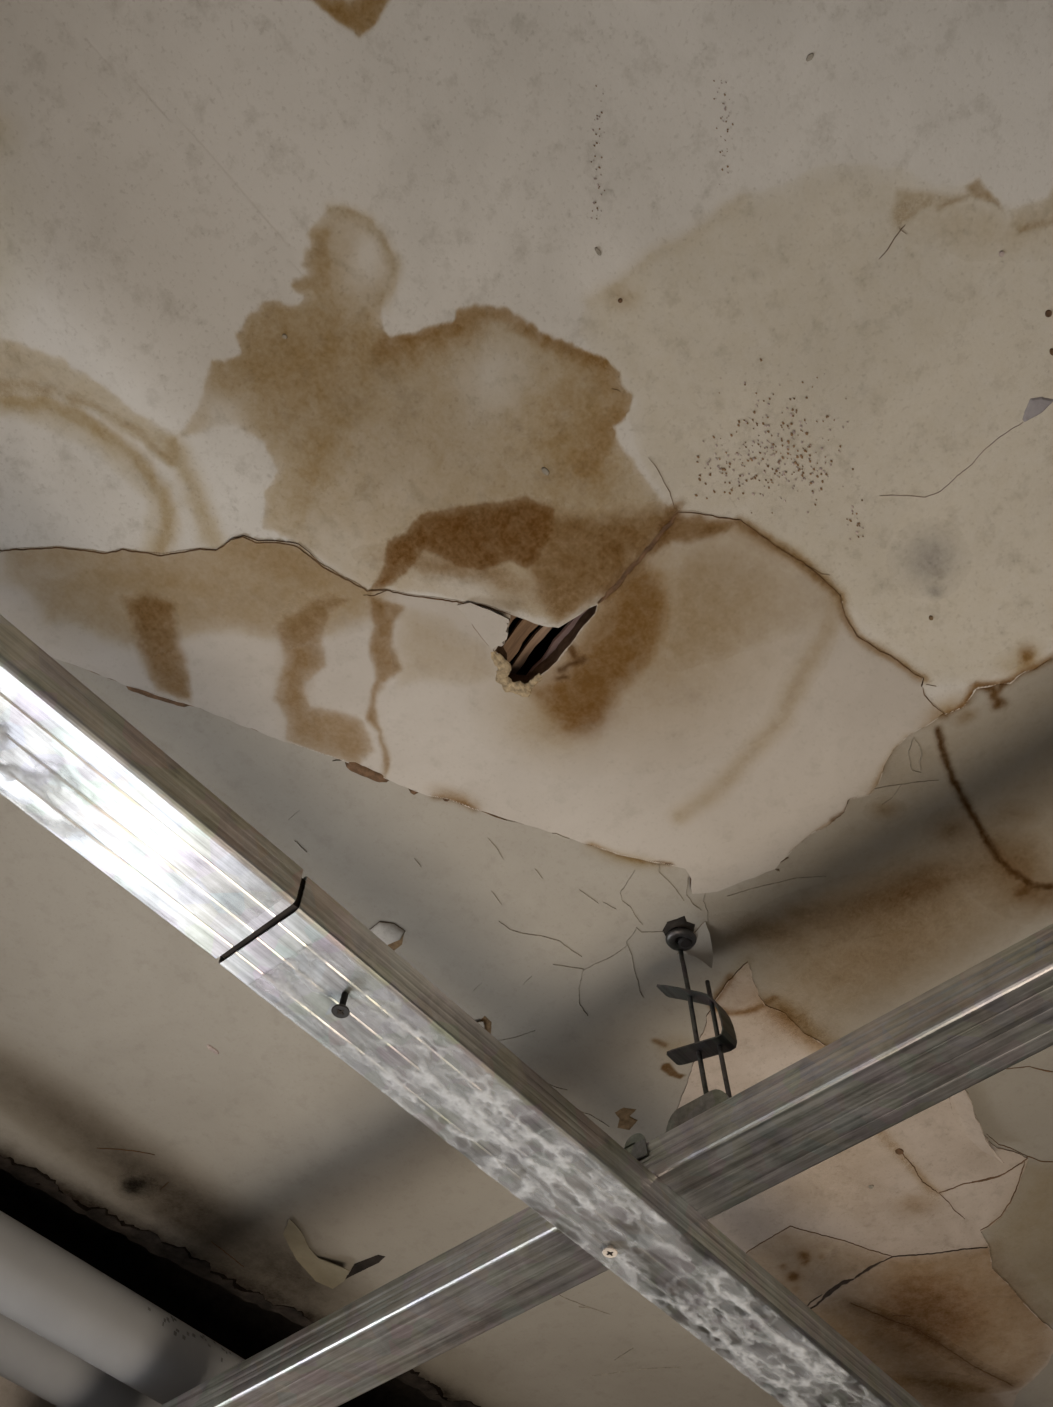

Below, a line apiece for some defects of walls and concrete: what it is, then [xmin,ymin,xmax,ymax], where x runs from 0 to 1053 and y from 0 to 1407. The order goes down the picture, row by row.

leakage [695,373,849,514]
crack [881,422,1023,498]
crack [0,536,510,652]
spalling [457,602,588,697]
crack [598,460,945,714]
crack [875,739,938,805]
crack [491,857,826,1016]
peeling [676,961,826,1110]
peeling [708,1090,1053,1407]